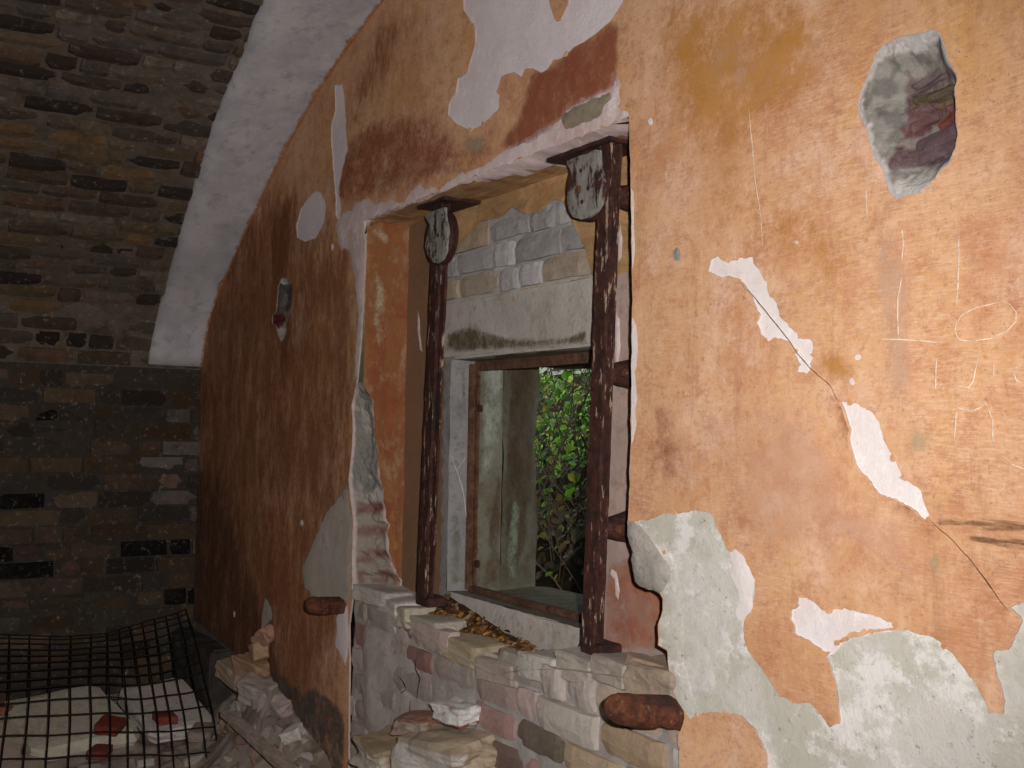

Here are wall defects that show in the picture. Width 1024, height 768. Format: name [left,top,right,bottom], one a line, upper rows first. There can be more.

flaking render [449,0,623,132]
flaking render [858,29,958,199]
flaking render [273,278,292,341]
crack [741,283,837,399]
flaking render [296,76,1024,768]
crack [931,521,1008,610]